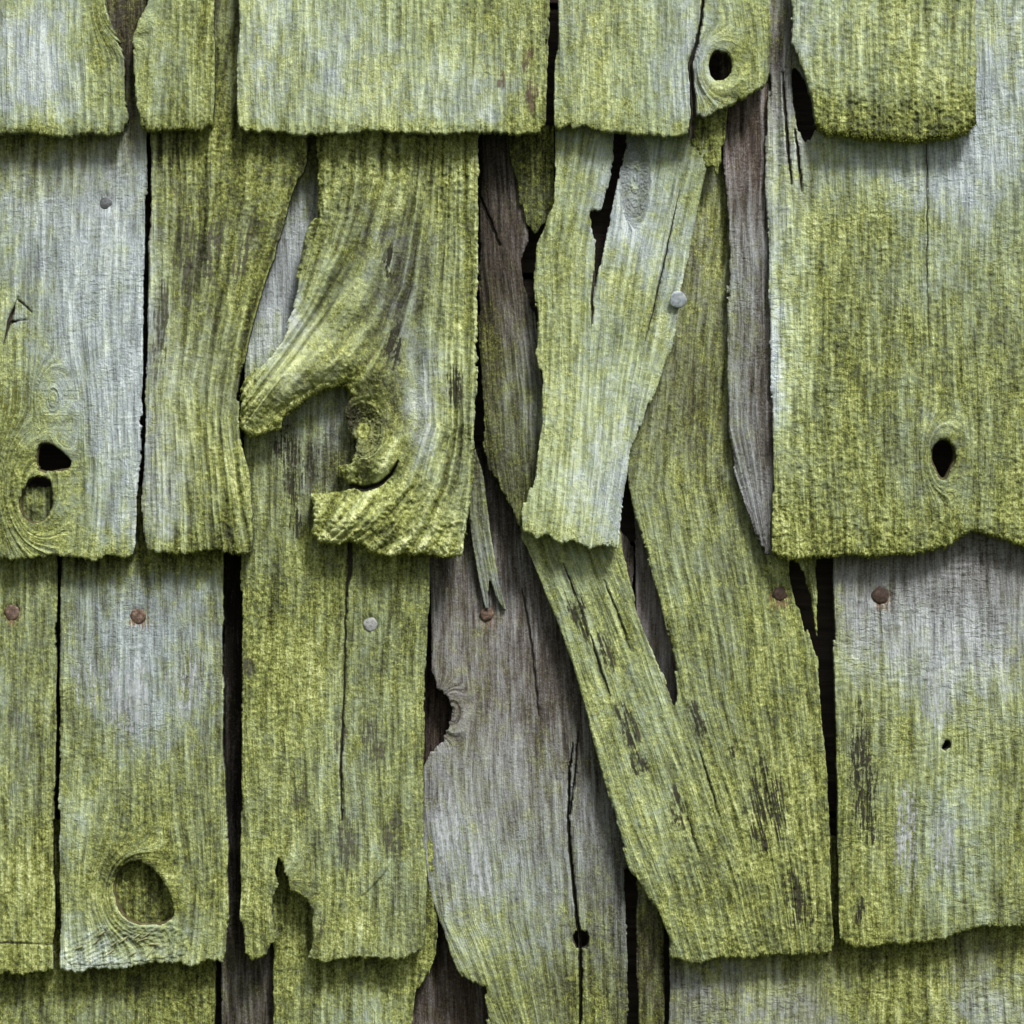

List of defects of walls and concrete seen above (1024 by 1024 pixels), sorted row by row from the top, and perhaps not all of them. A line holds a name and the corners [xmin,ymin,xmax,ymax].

crack [689,0,704,139]
crack [590,273,598,324]
crack [340,542,353,820]
crack [567,734,582,1024]